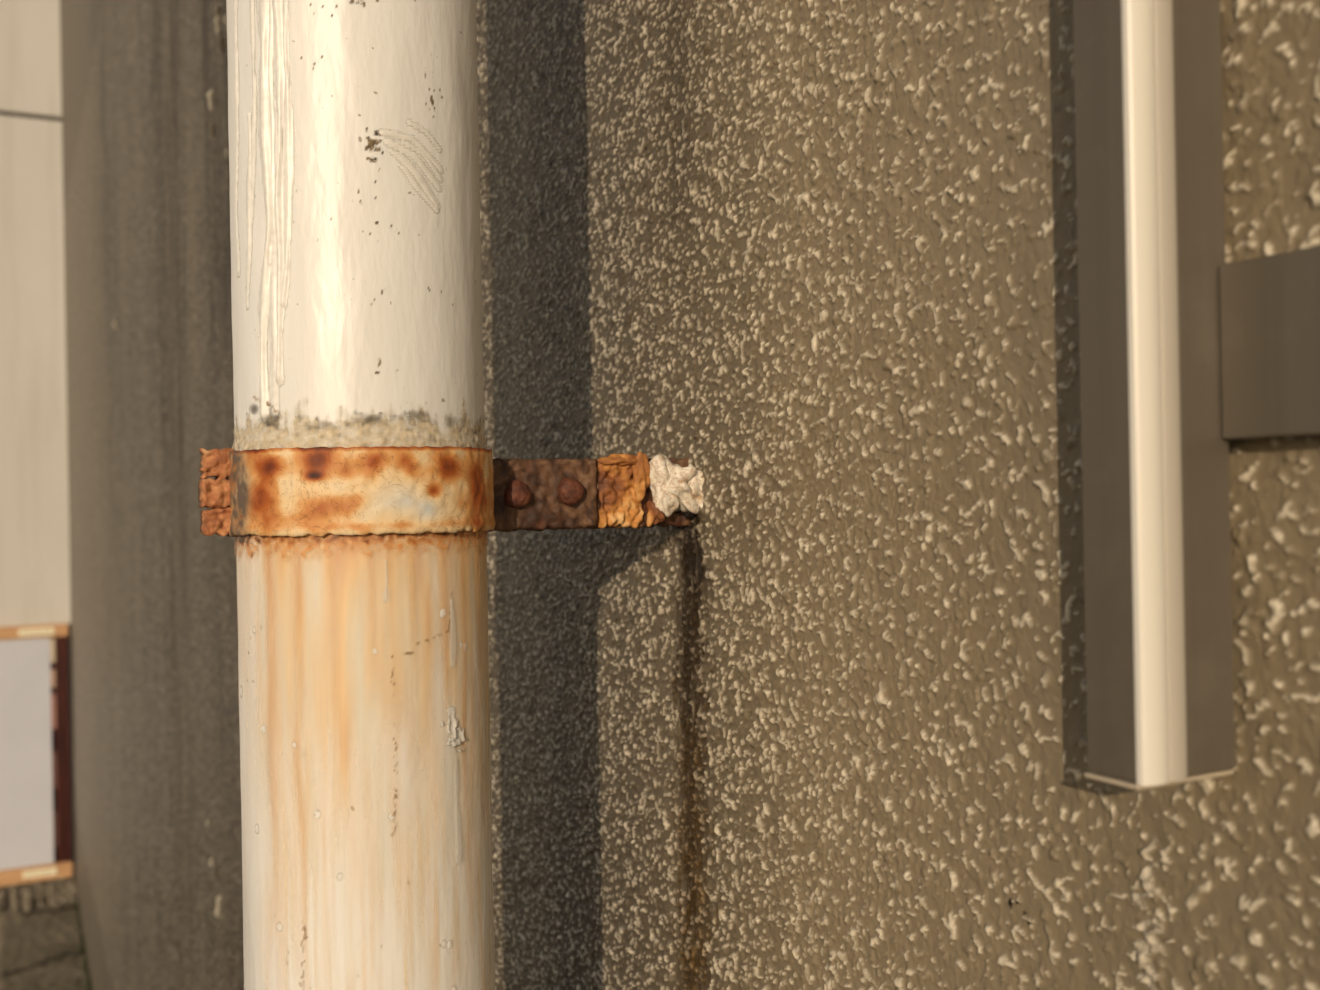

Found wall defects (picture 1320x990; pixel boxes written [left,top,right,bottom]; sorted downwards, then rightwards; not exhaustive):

corrosion [234,530,489,808]